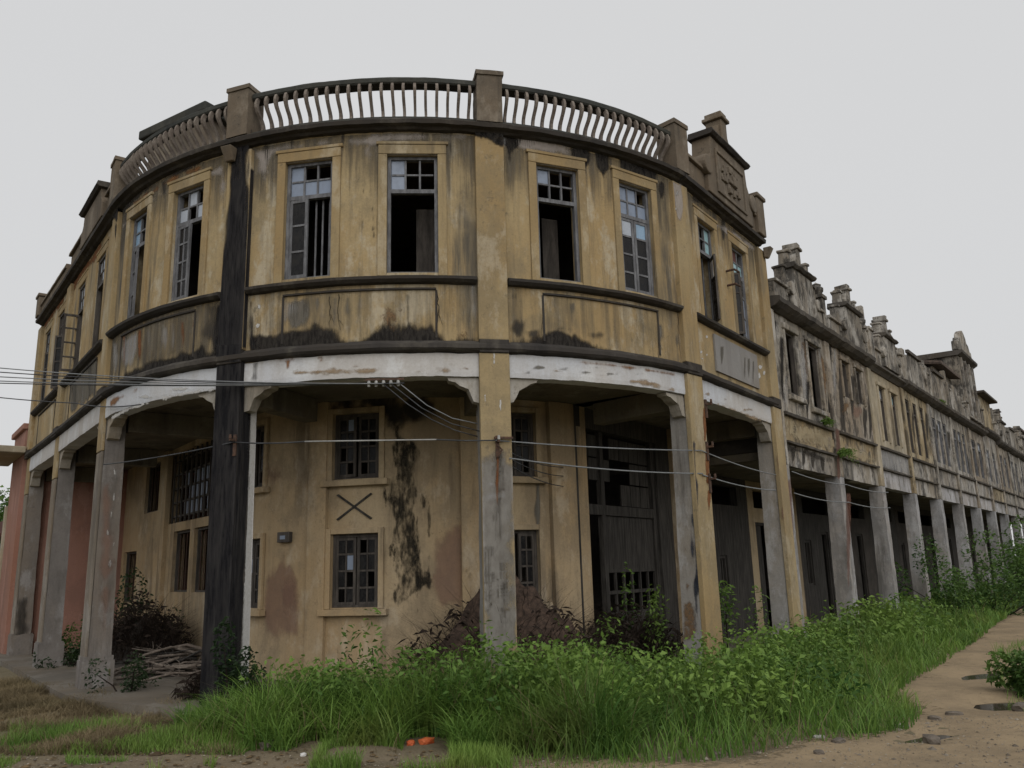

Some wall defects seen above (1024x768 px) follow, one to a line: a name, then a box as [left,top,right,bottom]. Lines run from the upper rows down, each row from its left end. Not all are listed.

water stain [70,119,669,705]